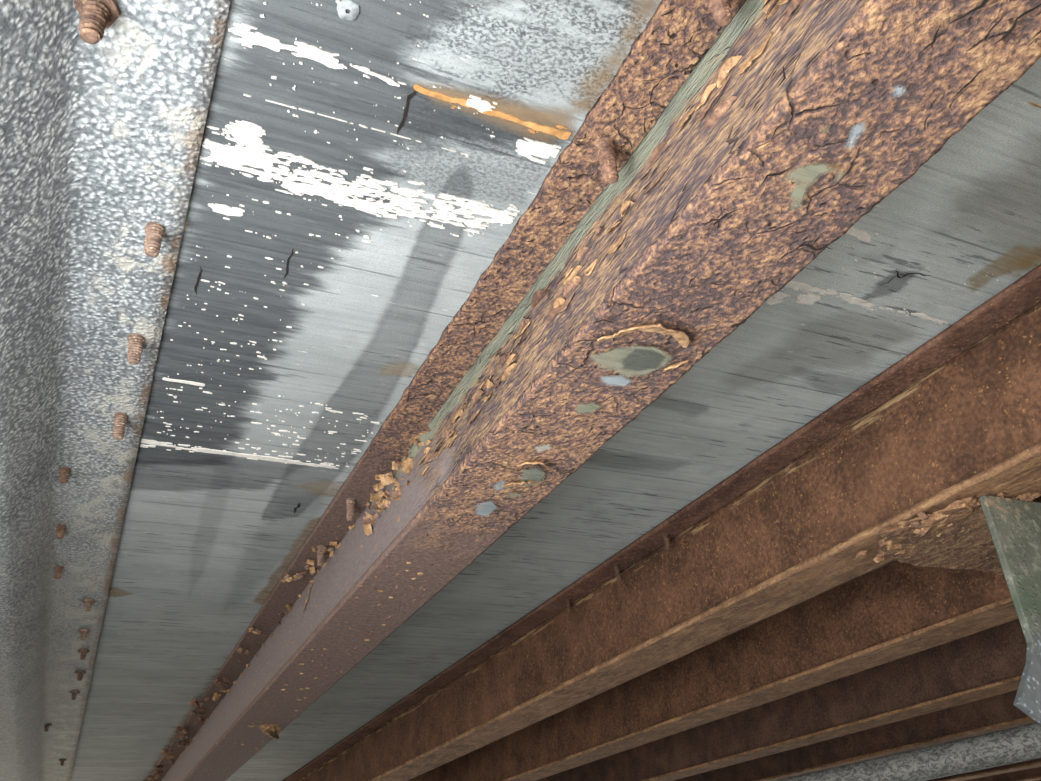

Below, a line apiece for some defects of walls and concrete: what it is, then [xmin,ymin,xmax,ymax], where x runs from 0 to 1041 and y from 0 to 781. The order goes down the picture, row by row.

peeling [228,2,406,109]
rust [677,0,804,129]
crack [919,0,989,54]
crack [952,4,1041,99]
peeling [265,99,422,150]
peeling [458,94,498,114]
rust [405,84,571,140]
peeling [515,137,561,164]
rust [418,167,669,476]
rust [597,324,690,370]
peeling [140,319,380,469]
rust [939,500,972,526]